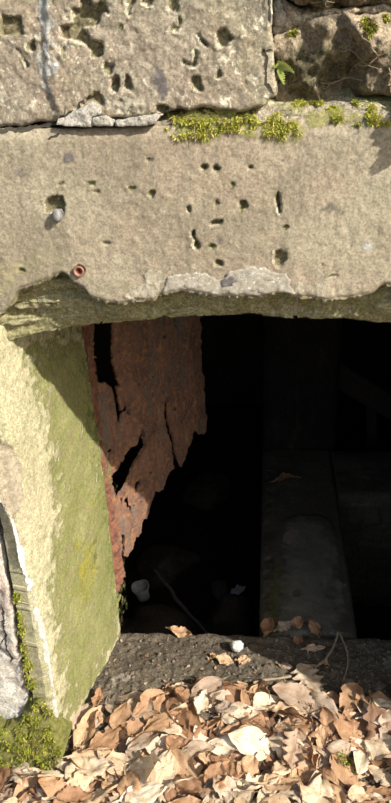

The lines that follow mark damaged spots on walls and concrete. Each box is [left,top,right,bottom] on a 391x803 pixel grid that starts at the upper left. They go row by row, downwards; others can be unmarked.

spalling [189,230,218,252]
spalling [0,250,391,341]
corrosion [81,315,208,593]